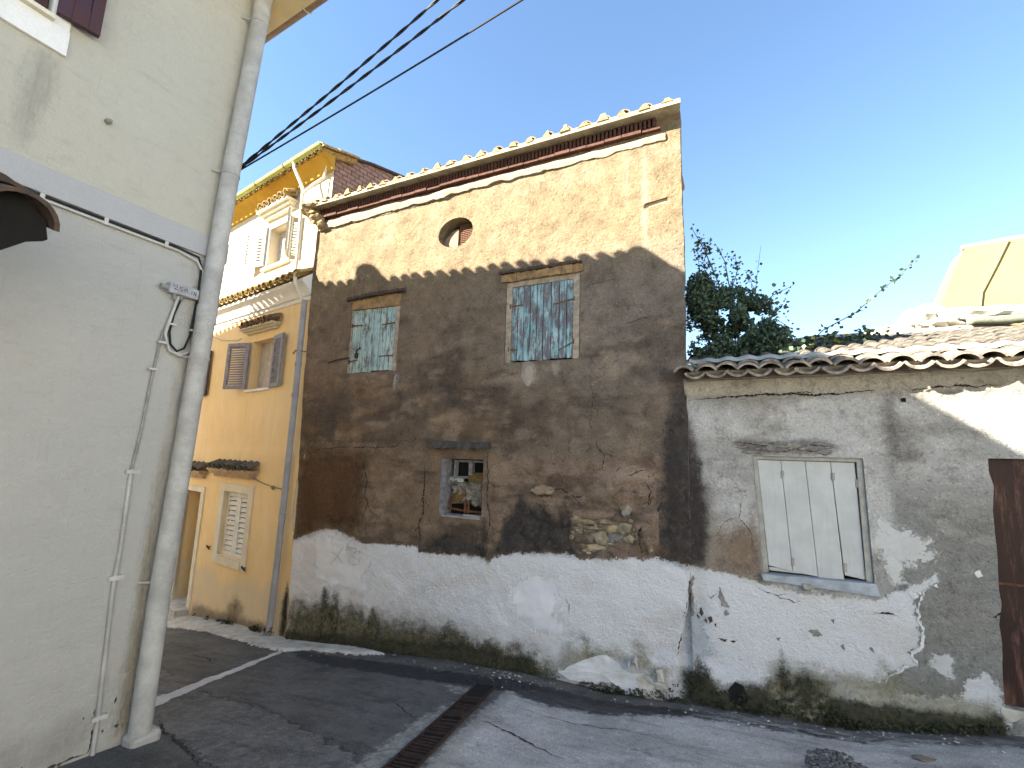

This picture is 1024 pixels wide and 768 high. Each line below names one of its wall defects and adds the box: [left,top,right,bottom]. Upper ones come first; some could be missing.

crack [414,467,429,549]
spalling [528,484,555,497]
spalling [569,504,639,554]
crack [589,373,663,553]
water stain [658,384,708,564]
water stain [364,610,380,641]
water stain [440,623,464,647]
spalling [689,576,736,643]
peeling [885,580,939,685]
water stain [778,666,818,705]
water stain [924,652,961,681]